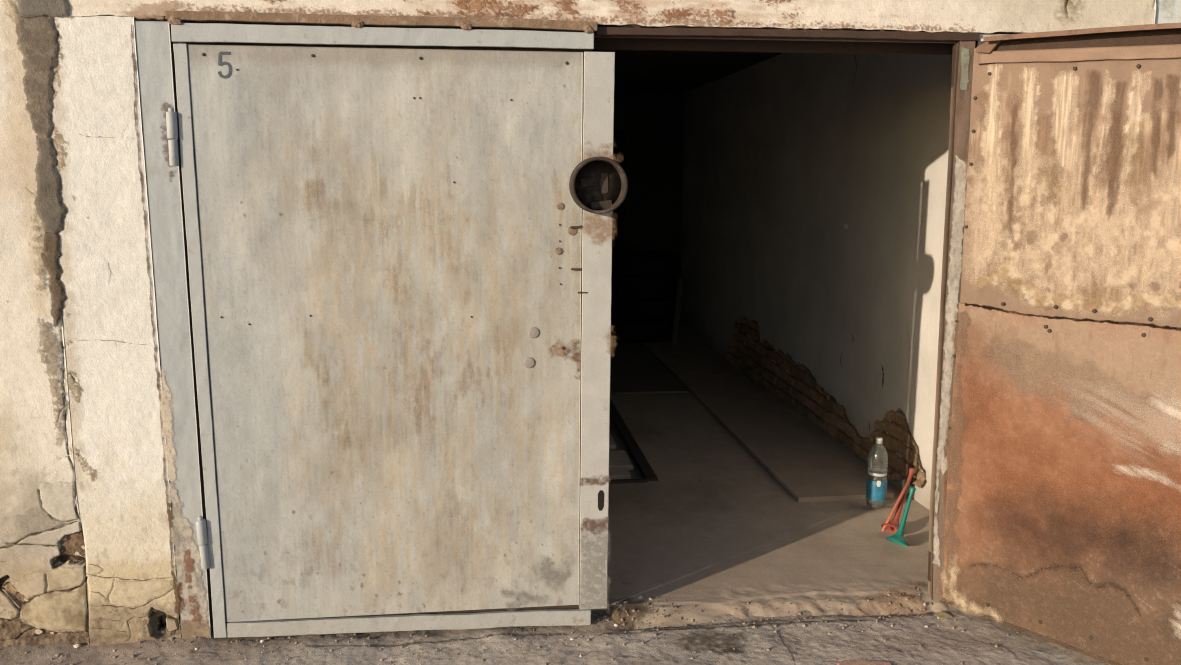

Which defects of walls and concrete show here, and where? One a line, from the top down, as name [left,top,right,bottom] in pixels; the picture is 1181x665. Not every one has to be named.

rust [183,0,876,29]
peeling [52,126,67,171]
water stain [966,64,1181,316]
peeling [31,192,45,291]
crack [0,25,179,640]
rust [552,341,581,378]
spalling [723,155,967,566]
peeling [150,371,210,639]
rust [581,517,609,535]